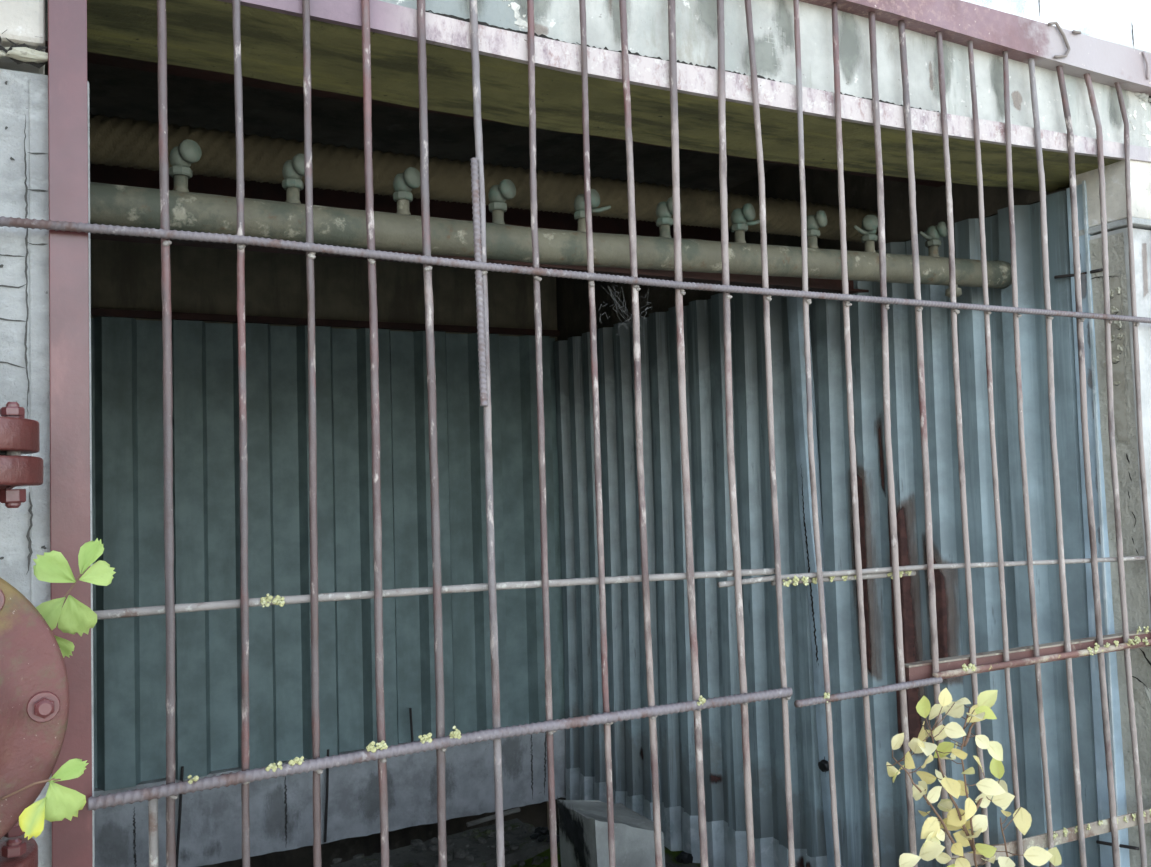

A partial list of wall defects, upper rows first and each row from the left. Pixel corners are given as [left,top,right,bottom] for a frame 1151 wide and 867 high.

peeling [503,0,528,28]
peeling [1129,92,1151,147]
crack [0,116,47,418]
corrosion [849,467,878,678]
corrosion [878,421,958,754]